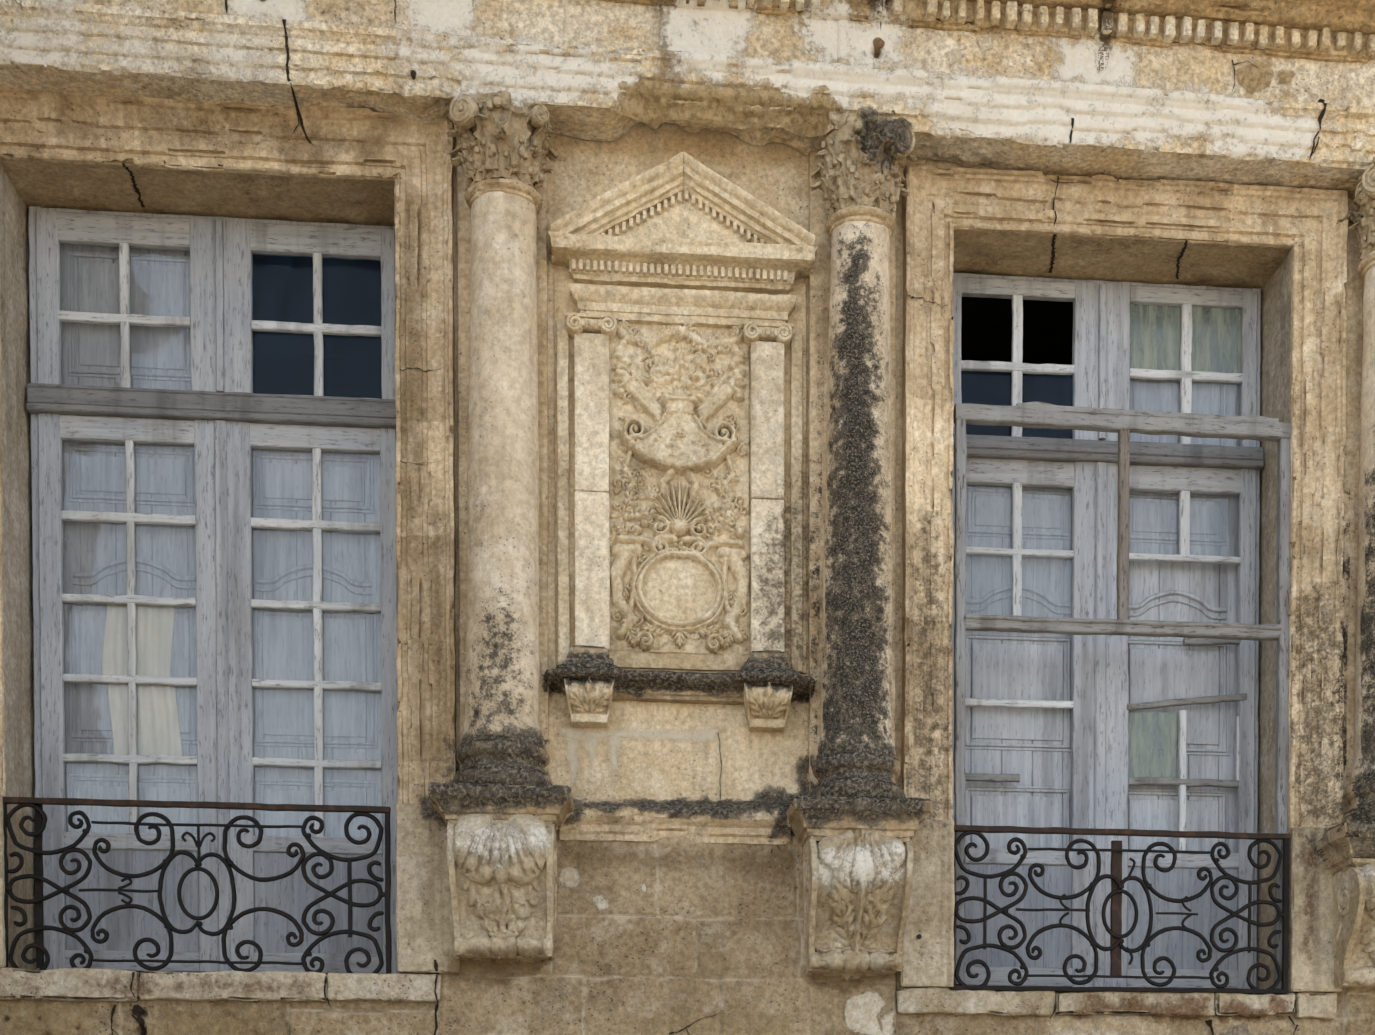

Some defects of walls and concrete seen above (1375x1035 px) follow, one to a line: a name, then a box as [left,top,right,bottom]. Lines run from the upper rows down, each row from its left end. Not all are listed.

crack [282,19,312,144]
crack [1067,118,1075,143]
crack [1309,99,1327,160]
crack [122,163,145,207]
crack [1048,176,1059,273]
crack [1175,240,1189,279]
leakage [542,454,929,890]
leakage [1309,523,1375,881]
crack [111,972,146,1035]
peeling [844,991,894,1035]
crack [1205,1019,1214,1035]